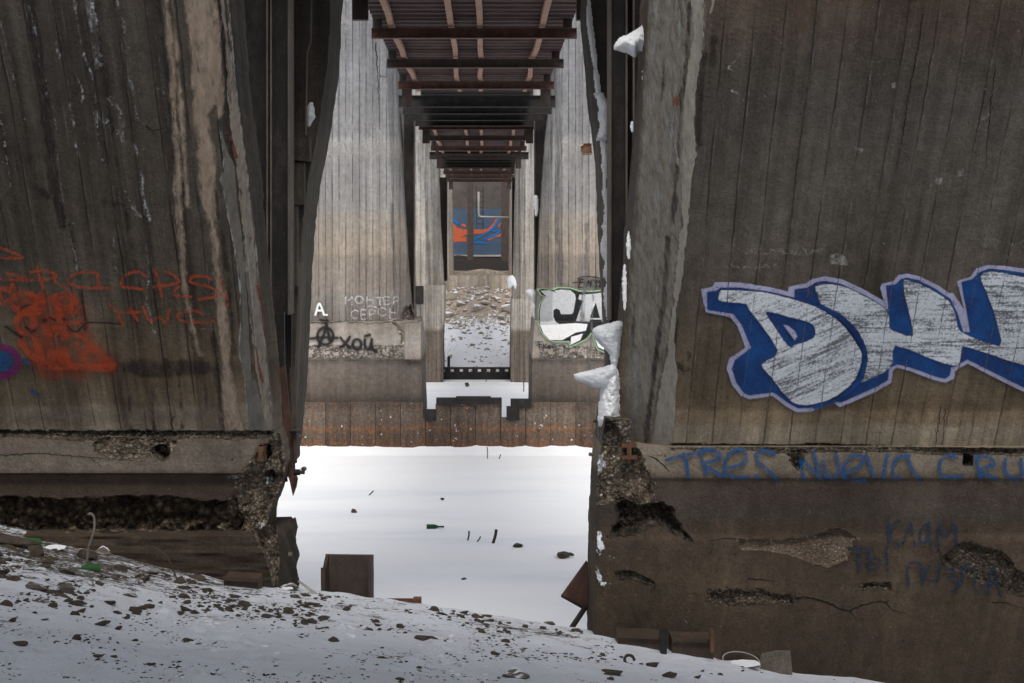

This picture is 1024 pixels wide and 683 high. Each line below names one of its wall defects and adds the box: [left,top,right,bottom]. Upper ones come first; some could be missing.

spalling [0,429,293,588]
spalling [588,446,694,542]
spalling [737,528,860,568]
spalling [615,570,656,588]
spalling [705,586,797,606]
crack [795,596,906,621]
spalling [943,541,1024,597]